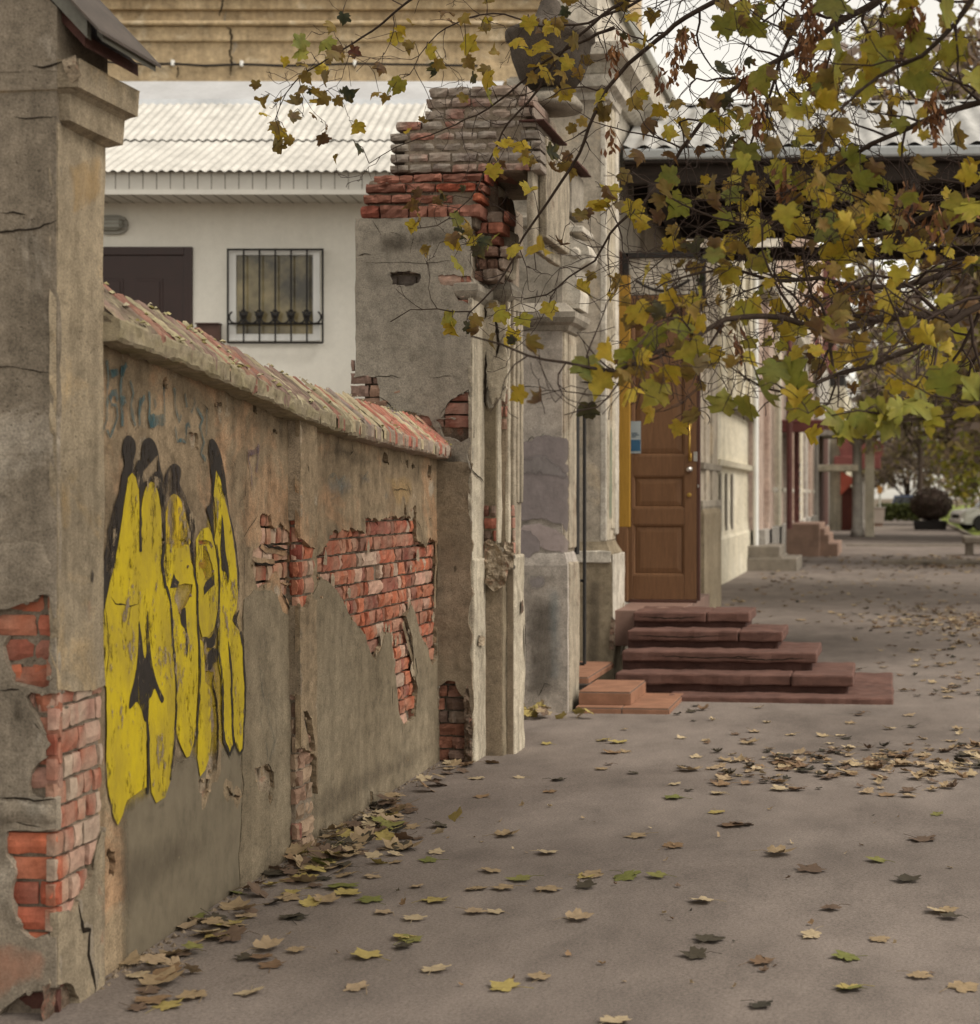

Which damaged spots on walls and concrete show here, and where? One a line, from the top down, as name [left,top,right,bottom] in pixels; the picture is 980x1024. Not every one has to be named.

crack [219,0,238,78]
crack [0,211,55,233]
spalling [391,270,421,287]
spalling [438,183,516,303]
spalling [350,360,400,406]
spalling [400,392,474,442]
spalling [483,505,516,591]
spalling [251,505,438,723]
spalling [437,680,473,762]
spalling [0,594,111,938]
spalling [290,694,316,857]
crack [79,899,100,992]